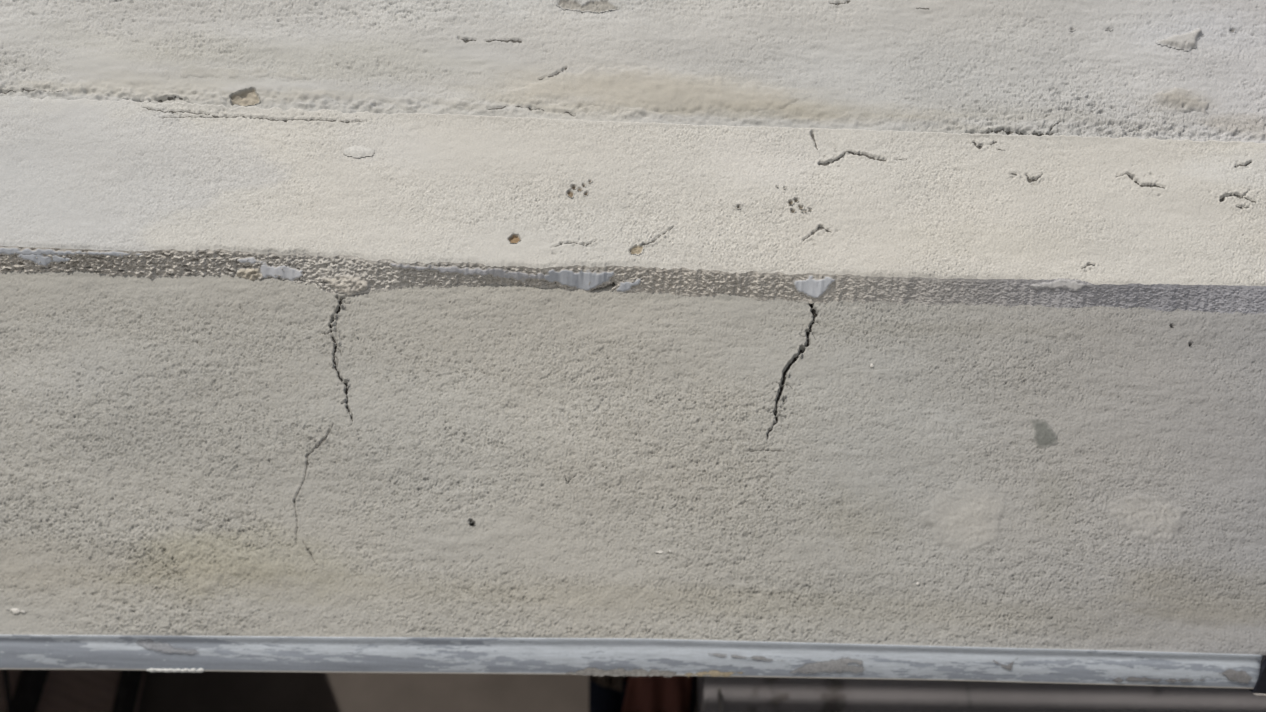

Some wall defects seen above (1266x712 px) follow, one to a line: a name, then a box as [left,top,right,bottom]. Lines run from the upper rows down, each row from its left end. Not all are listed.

crack [294,297,353,562]
crack [747,304,821,452]